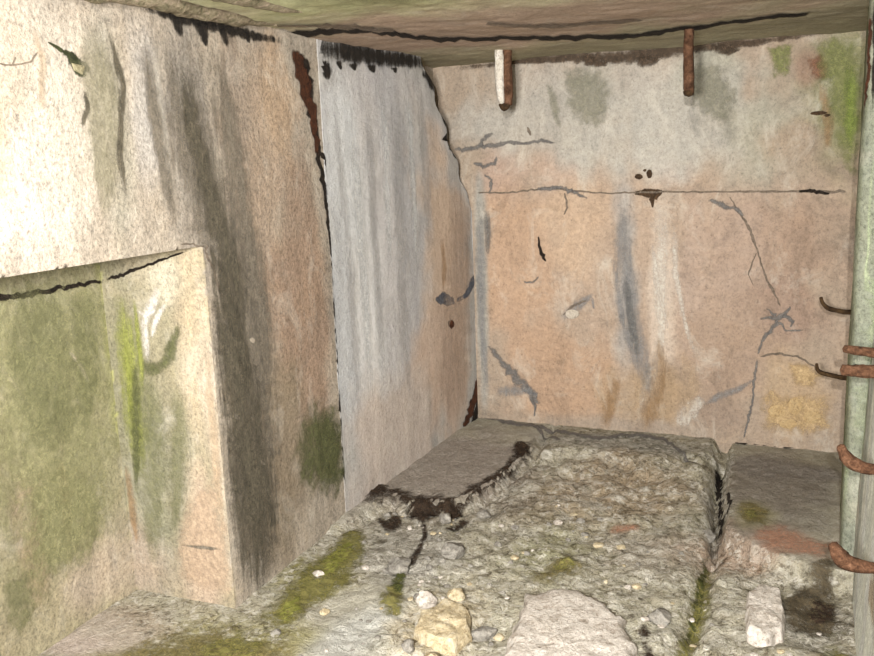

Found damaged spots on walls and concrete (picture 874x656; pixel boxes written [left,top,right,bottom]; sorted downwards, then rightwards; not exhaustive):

crack [278,13,808,269]
water stain [125,293,164,482]
water stain [145,54,278,578]
crack [333,300,345,479]
crack [441,115,845,463]
water stain [616,226,688,397]